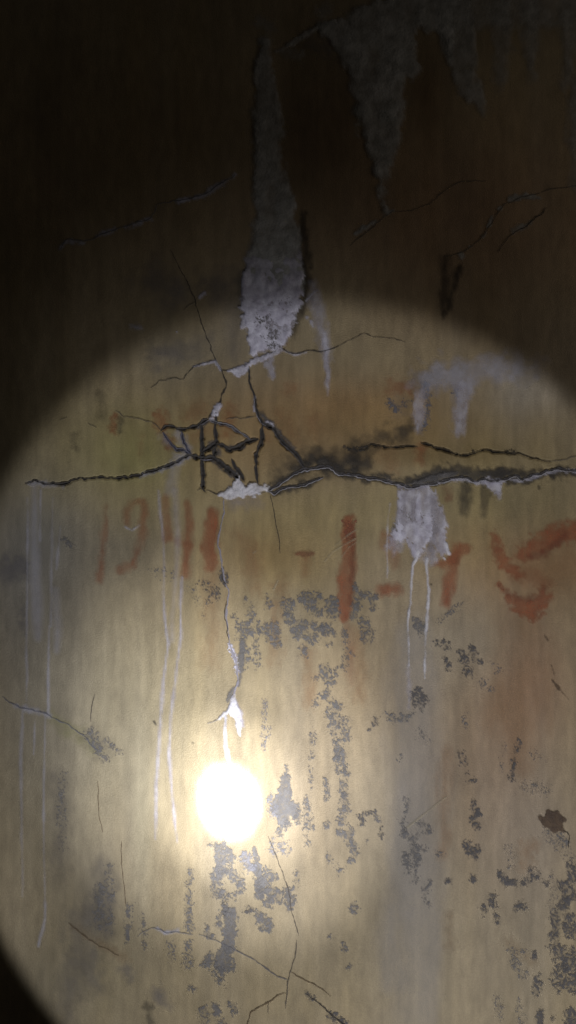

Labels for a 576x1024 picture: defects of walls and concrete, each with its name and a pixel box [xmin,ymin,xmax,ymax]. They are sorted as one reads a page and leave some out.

damp [238,0,483,374]
crack [140,837,348,1024]
peeling [166,582,383,1024]
crack [25,251,576,759]
peeling [367,687,430,740]
efflorescence [391,487,451,631]
peeling [399,796,450,906]
peeling [412,602,501,692]
peeling [462,800,483,861]
peeling [481,810,576,1024]